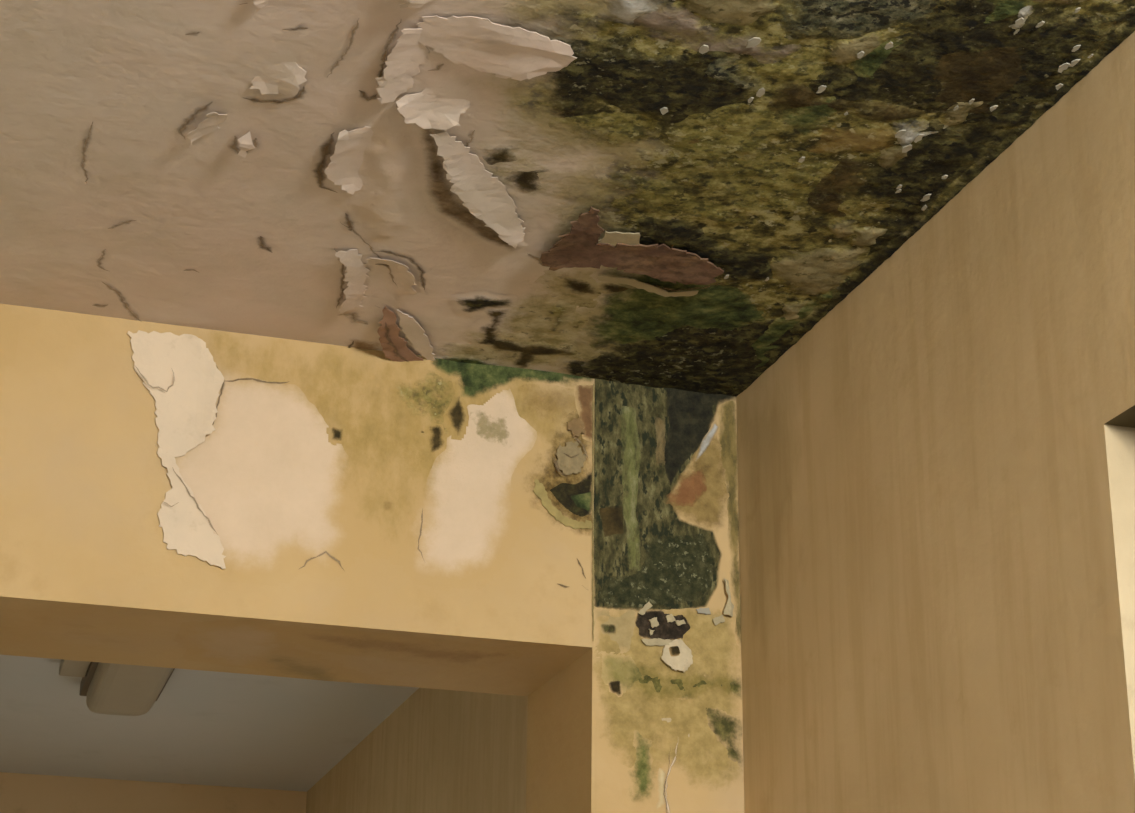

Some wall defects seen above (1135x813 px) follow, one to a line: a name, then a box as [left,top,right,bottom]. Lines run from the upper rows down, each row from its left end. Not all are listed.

peeling [408,123,727,297]
flaking render [127,330,361,586]
leakage [157,324,594,565]
peeling [333,305,435,362]
flaking render [400,389,537,591]
flaking render [663,420,729,541]
leakage [418,0,1135,813]
flaking render [593,579,734,672]